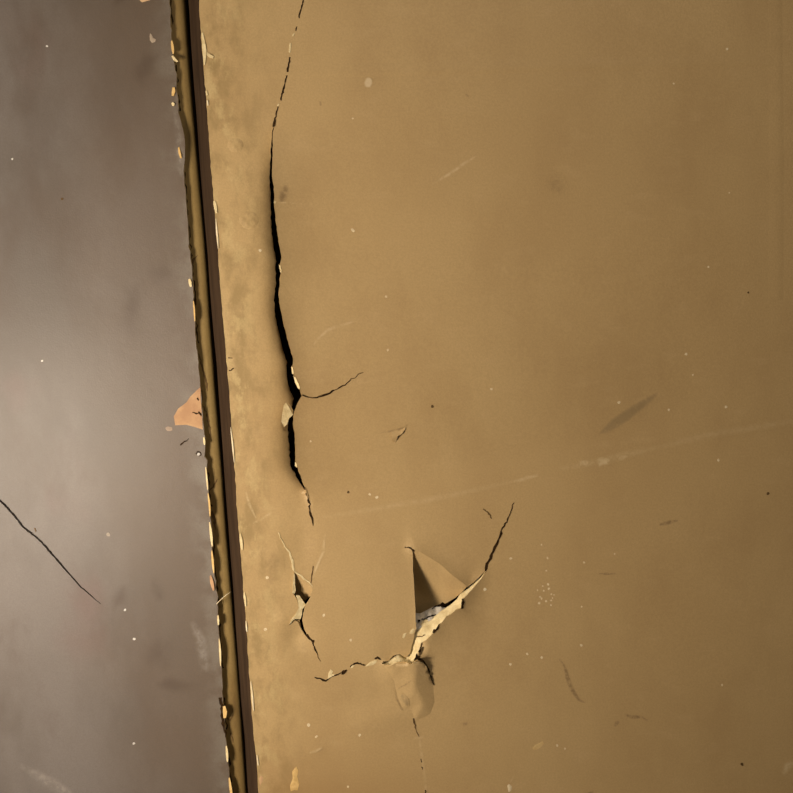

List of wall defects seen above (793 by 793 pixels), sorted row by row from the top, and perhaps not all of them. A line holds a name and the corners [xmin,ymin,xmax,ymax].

crack [270,0,364,524]
peeling [165,387,205,456]
crack [0,501,98,602]
crack [413,718,428,793]